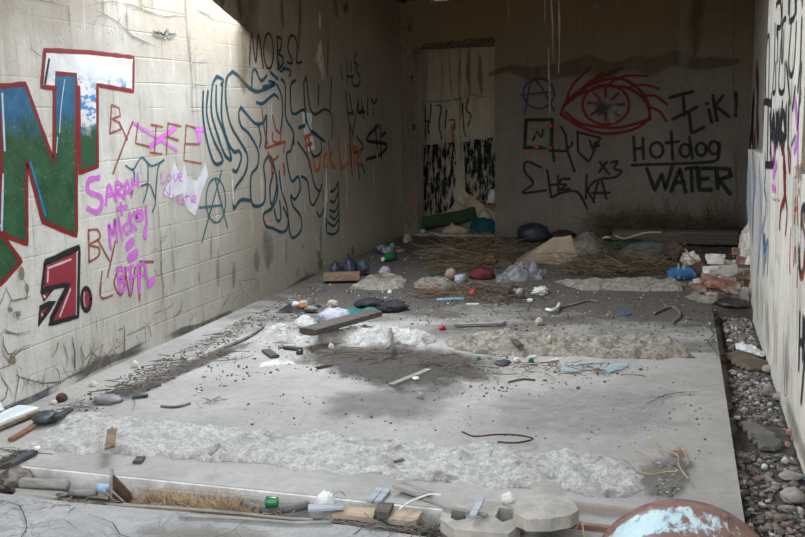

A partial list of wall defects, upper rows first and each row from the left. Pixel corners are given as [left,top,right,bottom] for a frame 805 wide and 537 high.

crack [93,0,213,112]
crack [0,223,260,402]
crack [1,500,128,537]